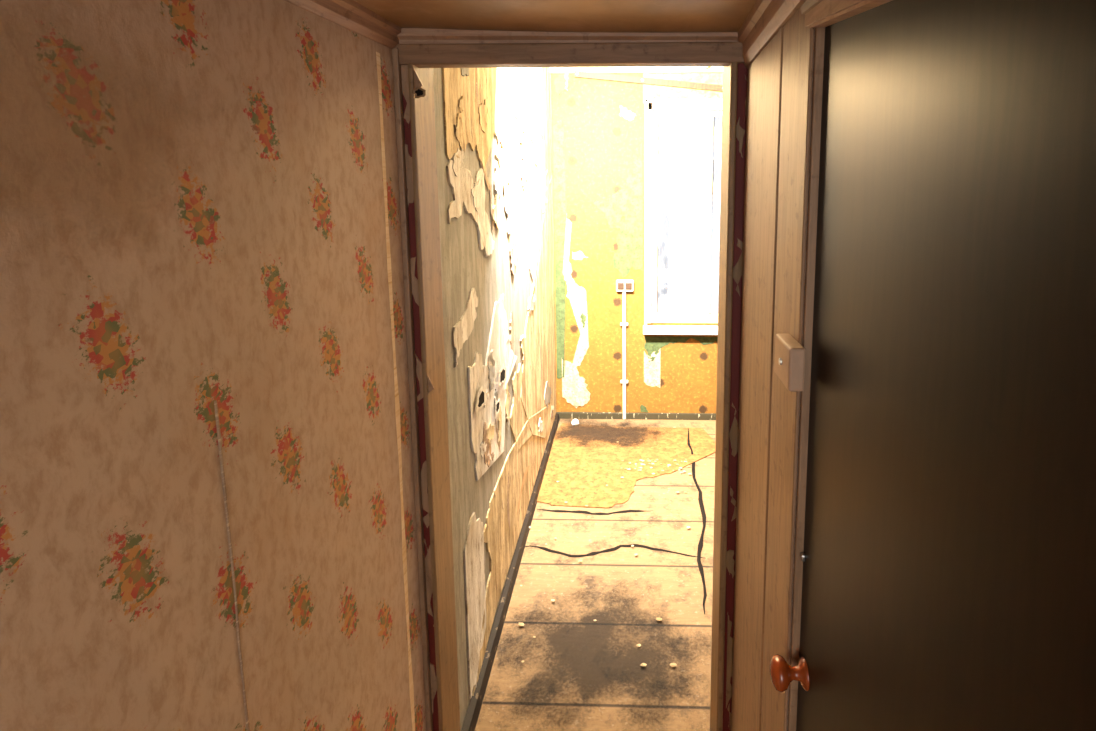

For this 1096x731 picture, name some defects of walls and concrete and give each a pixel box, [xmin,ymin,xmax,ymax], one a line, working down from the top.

peeling [442,67,590,699]
peeling [594,143,643,278]